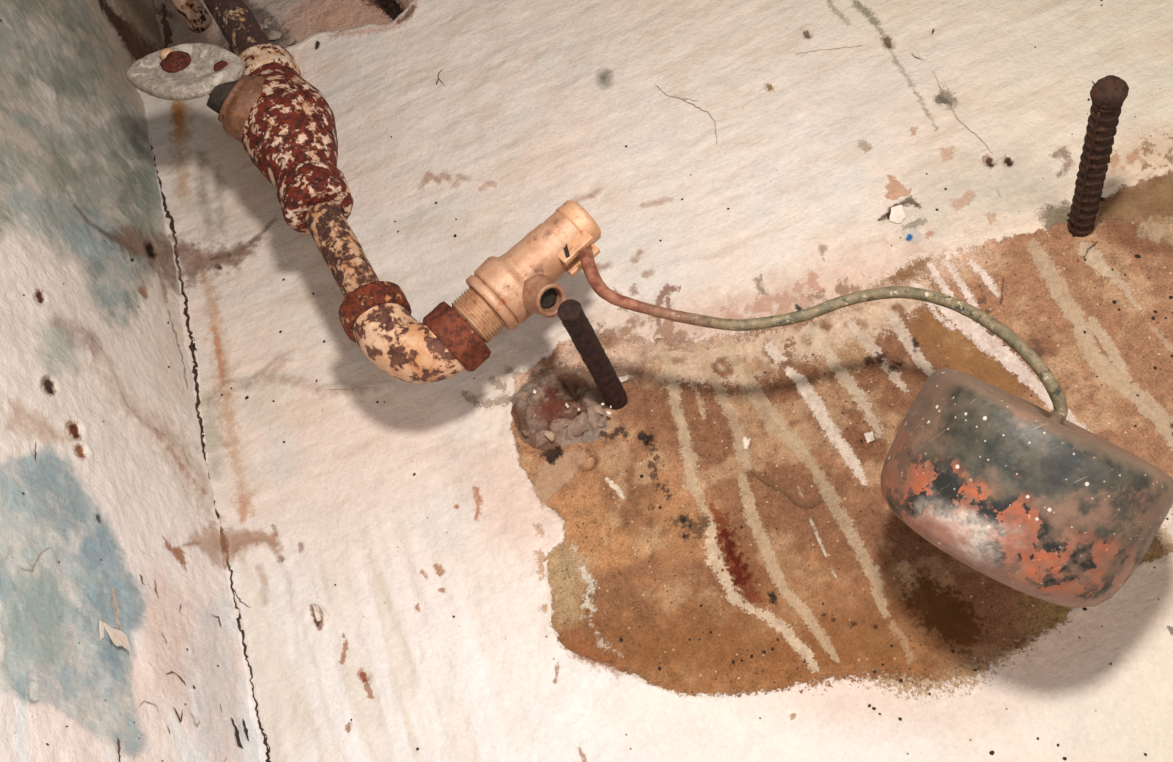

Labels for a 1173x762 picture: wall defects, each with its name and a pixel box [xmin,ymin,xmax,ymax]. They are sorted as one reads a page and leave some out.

spalling [154,0,234,53]
spalling [244,0,419,52]
crack [139,143,272,762]
leakage [595,313,839,673]
leakage [722,277,861,319]
flaking render [461,75,1173,698]
leakage [762,321,884,486]
leakage [844,308,935,392]
leakage [886,256,1054,410]
leakage [1034,242,1173,451]
leakage [1161,505,1173,539]
leakage [861,613,1075,703]